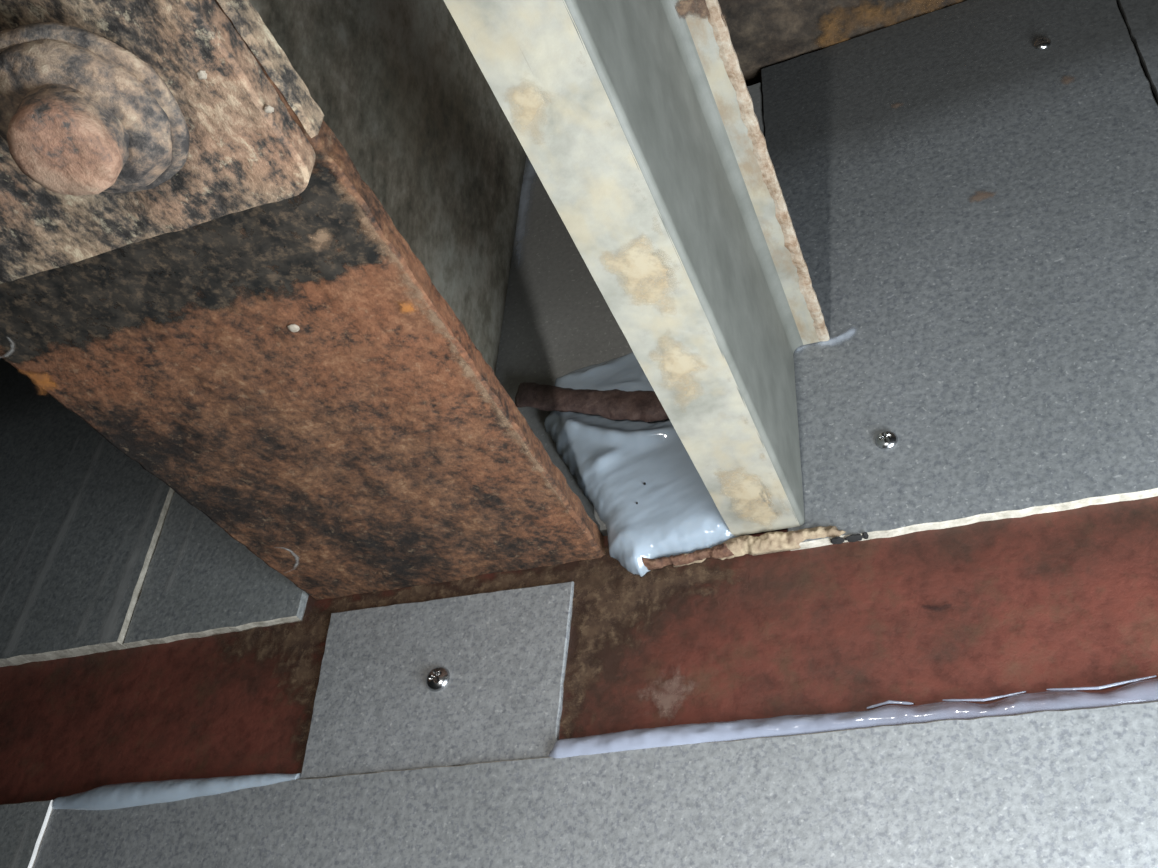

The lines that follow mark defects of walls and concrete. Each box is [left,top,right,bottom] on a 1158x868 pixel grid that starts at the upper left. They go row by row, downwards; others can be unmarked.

corrosion [217,0,324,138]
corrosion [675,0,830,341]
corrosion [310,230,331,250]
corrosion [27,372,56,394]
corrosion [340,188,561,500]
corrosion [515,382,669,422]